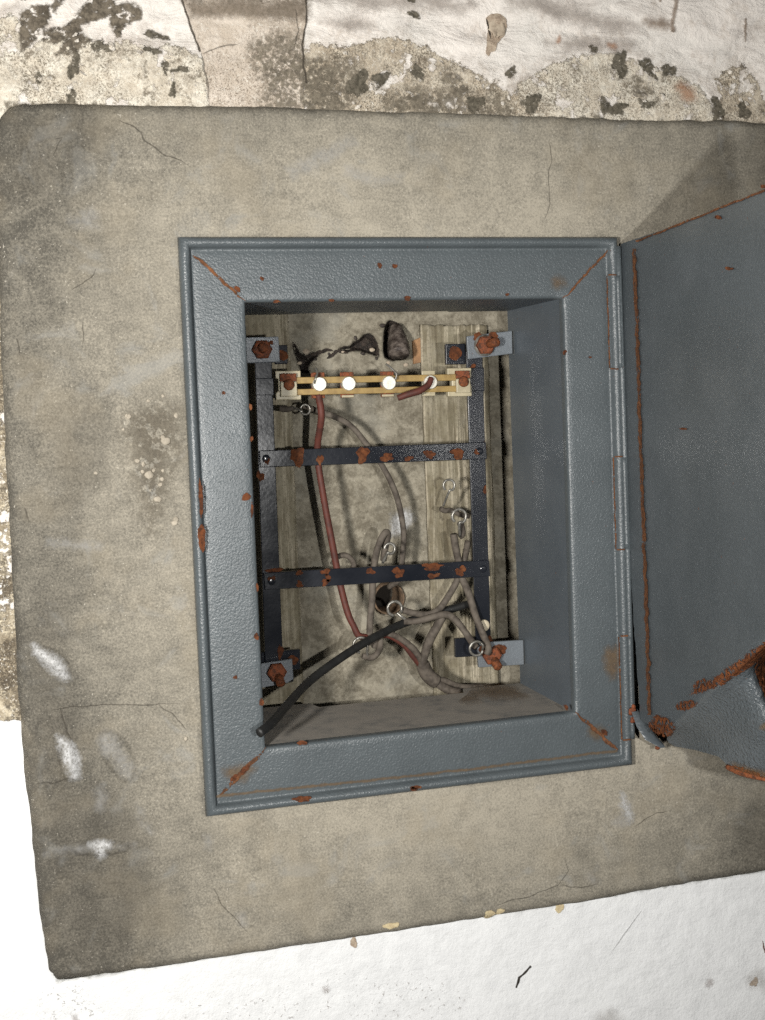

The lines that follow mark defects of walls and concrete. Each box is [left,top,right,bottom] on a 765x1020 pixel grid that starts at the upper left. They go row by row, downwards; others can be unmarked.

damp [19,0,142,105]
damp [143,29,188,98]
crack [181,0,201,52]
crack [300,0,308,84]
flaking render [486,13,507,56]
peeling [300,36,765,124]